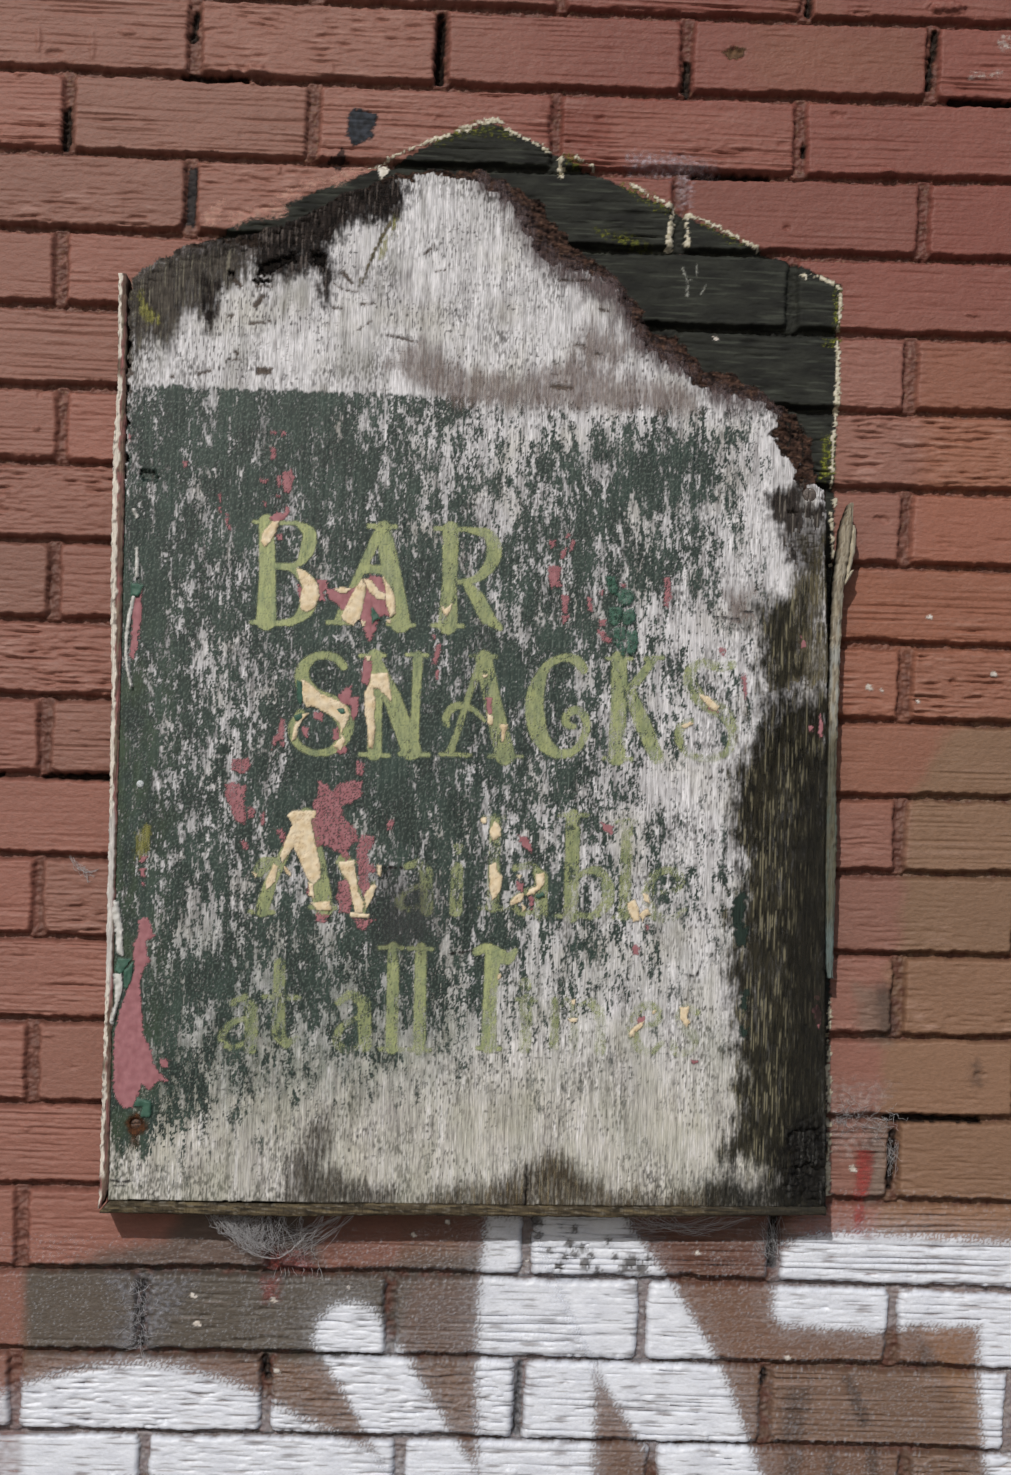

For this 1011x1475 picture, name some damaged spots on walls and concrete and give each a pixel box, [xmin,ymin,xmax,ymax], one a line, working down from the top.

peeling [186,168,198,228]
peeling [204,108,843,639]